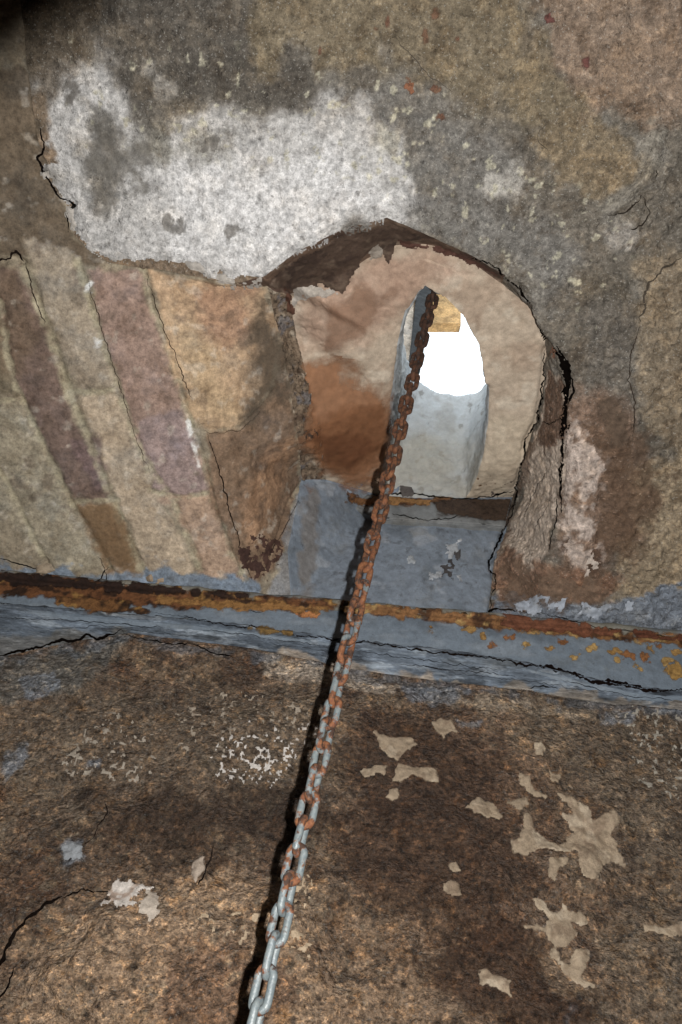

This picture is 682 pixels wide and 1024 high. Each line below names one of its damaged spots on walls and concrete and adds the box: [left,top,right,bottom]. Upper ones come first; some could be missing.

water stain [65,82,80,104]
water stain [162,214,184,233]
water stain [225,225,241,239]
crack [87,276,150,472]
crack [374,325,633,632]
corrosion [0,570,682,680]
crack [0,609,682,703]
spalling [360,730,439,801]
spalling [465,771,626,881]
crack [0,888,108,997]
spalling [100,877,160,922]
spalling [523,898,596,988]